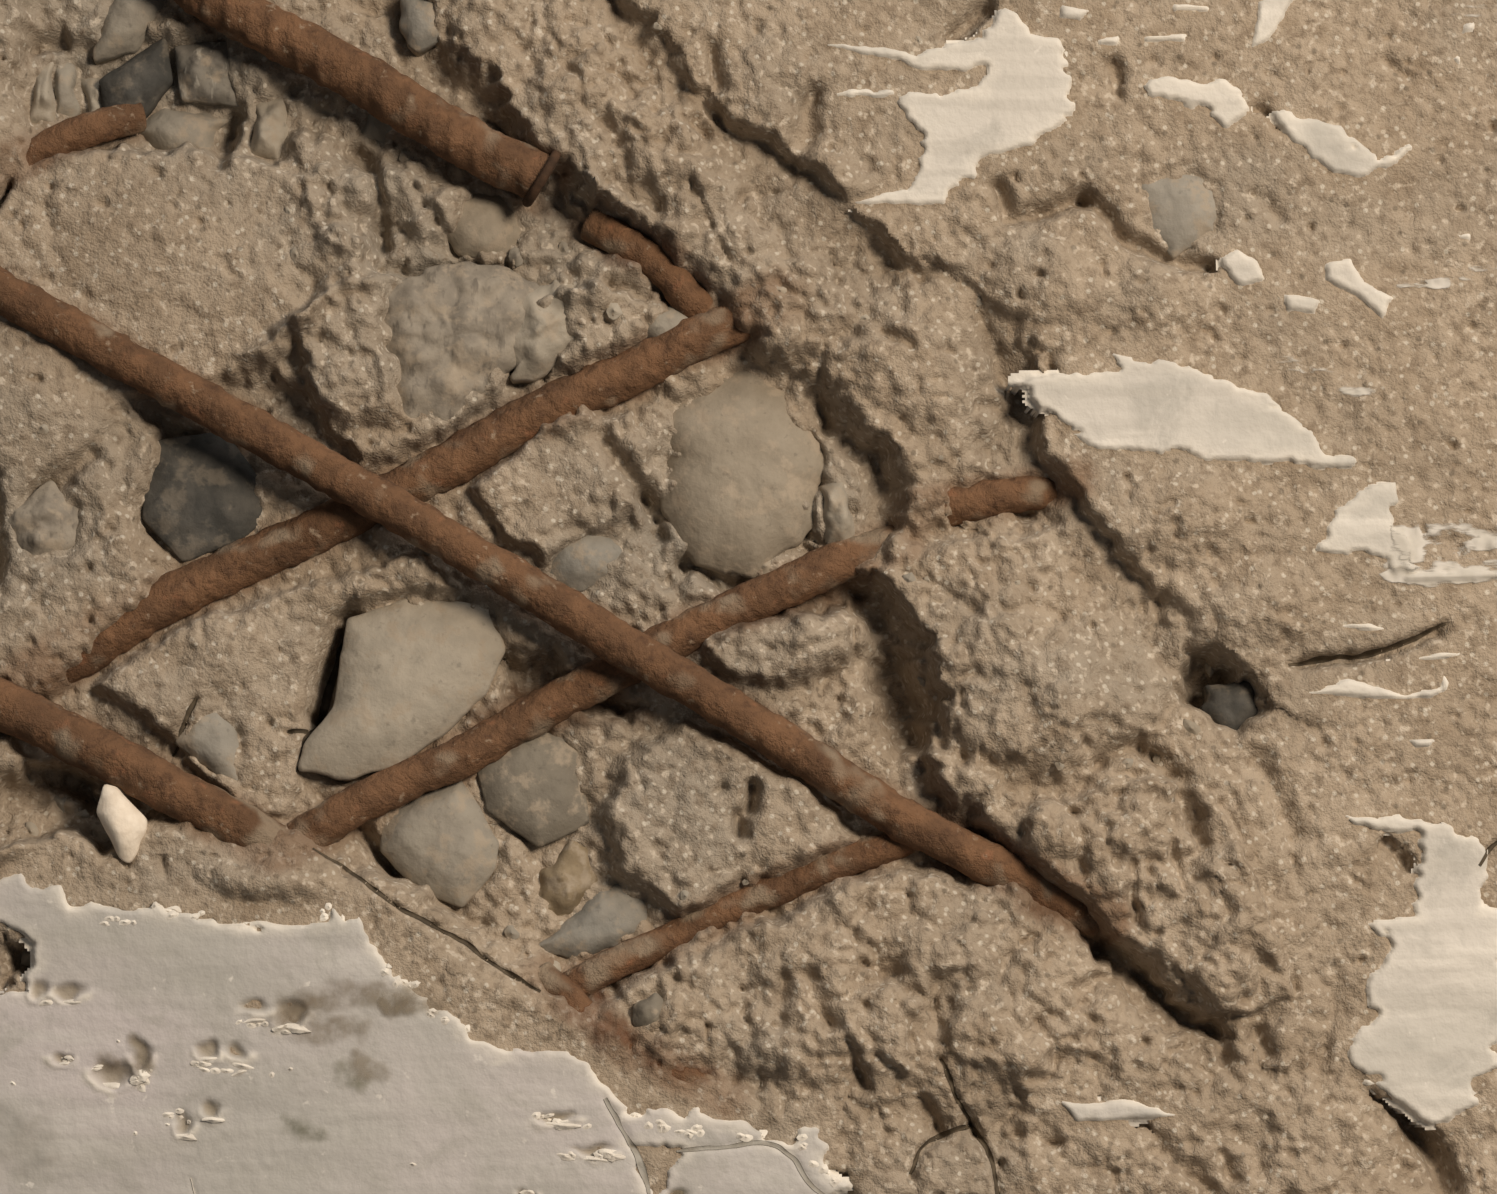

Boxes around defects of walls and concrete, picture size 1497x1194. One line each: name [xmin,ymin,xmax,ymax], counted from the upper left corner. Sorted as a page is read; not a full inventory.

peeling [1252,0,1295,47]
peeling [828,8,1075,205]
peeling [1216,249,1264,286]
peeling [1325,259,1393,318]
peeling [1005,353,1357,470]
spalling [235,444,332,537]
spalling [1183,719,1201,735]
spalling [0,732,115,851]
crack [313,848,541,992]
peeling [1345,814,1497,1131]
peeling [0,873,853,1194]
peeling [1061,1099,1175,1127]